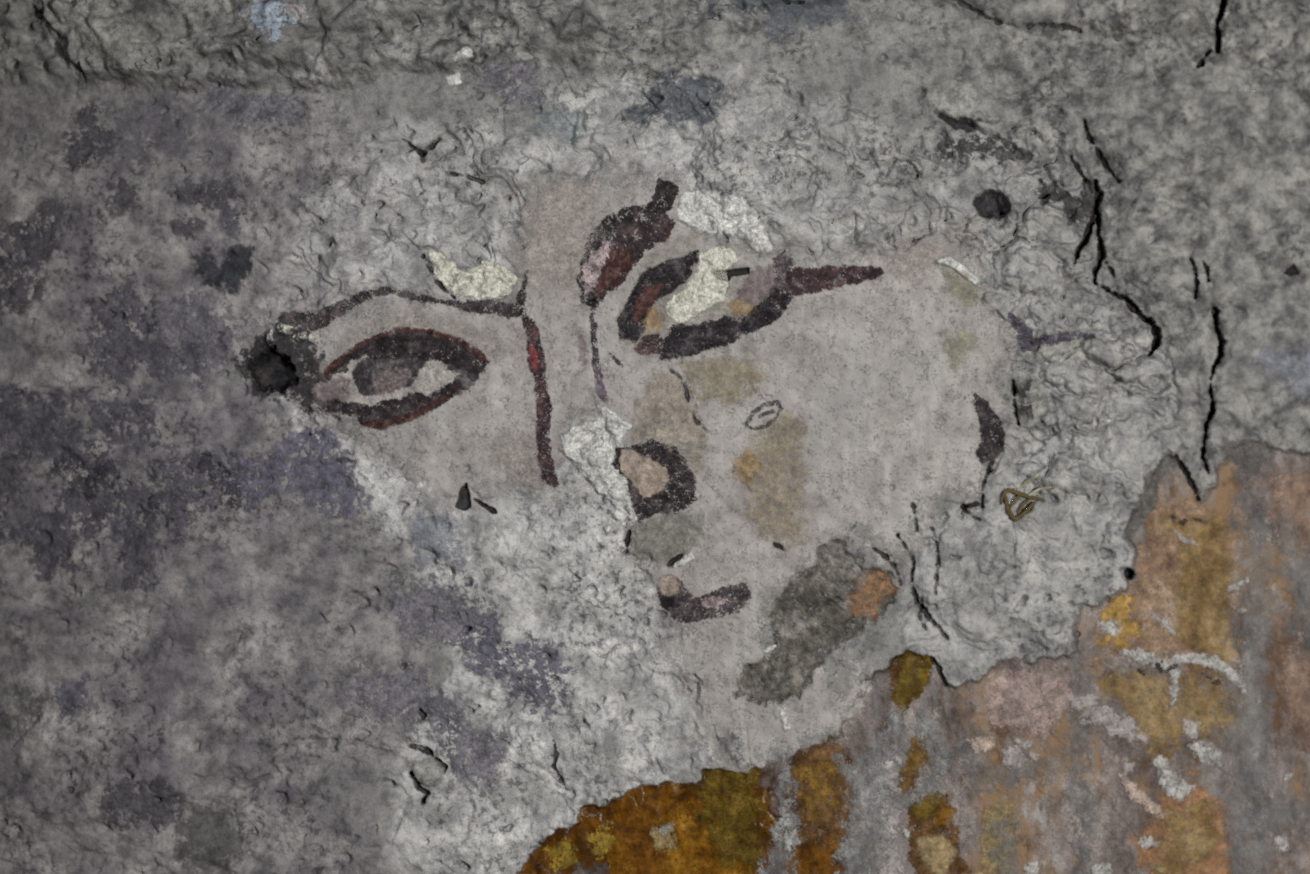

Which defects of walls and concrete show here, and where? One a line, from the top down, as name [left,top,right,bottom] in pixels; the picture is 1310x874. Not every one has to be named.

crack [1196,0,1226,68]
crack [1070,119,1162,356]
crack [960,465,991,521]
crack [1012,380,1020,426]
crack [1172,258,1226,525]
crack [873,503,948,686]
spalling [733,441,1310,874]